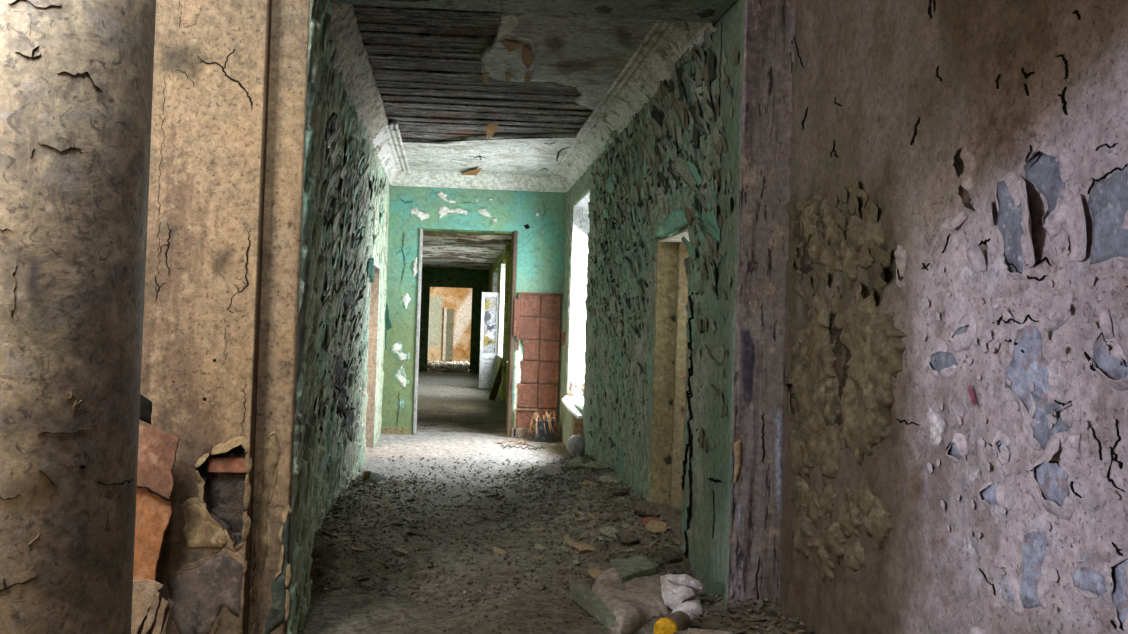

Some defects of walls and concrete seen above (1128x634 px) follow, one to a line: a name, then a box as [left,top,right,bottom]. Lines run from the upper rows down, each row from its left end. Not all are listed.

crack [16,46,102,91]
crack [155,49,253,301]
peeling [314,39,386,452]
peeling [410,190,498,226]
flaking render [353,0,593,141]
peeling [567,8,738,460]
crack [995,54,1069,115]
peeling [941,138,1128,286]
flaking render [167,431,292,634]
peeling [922,279,1128,634]